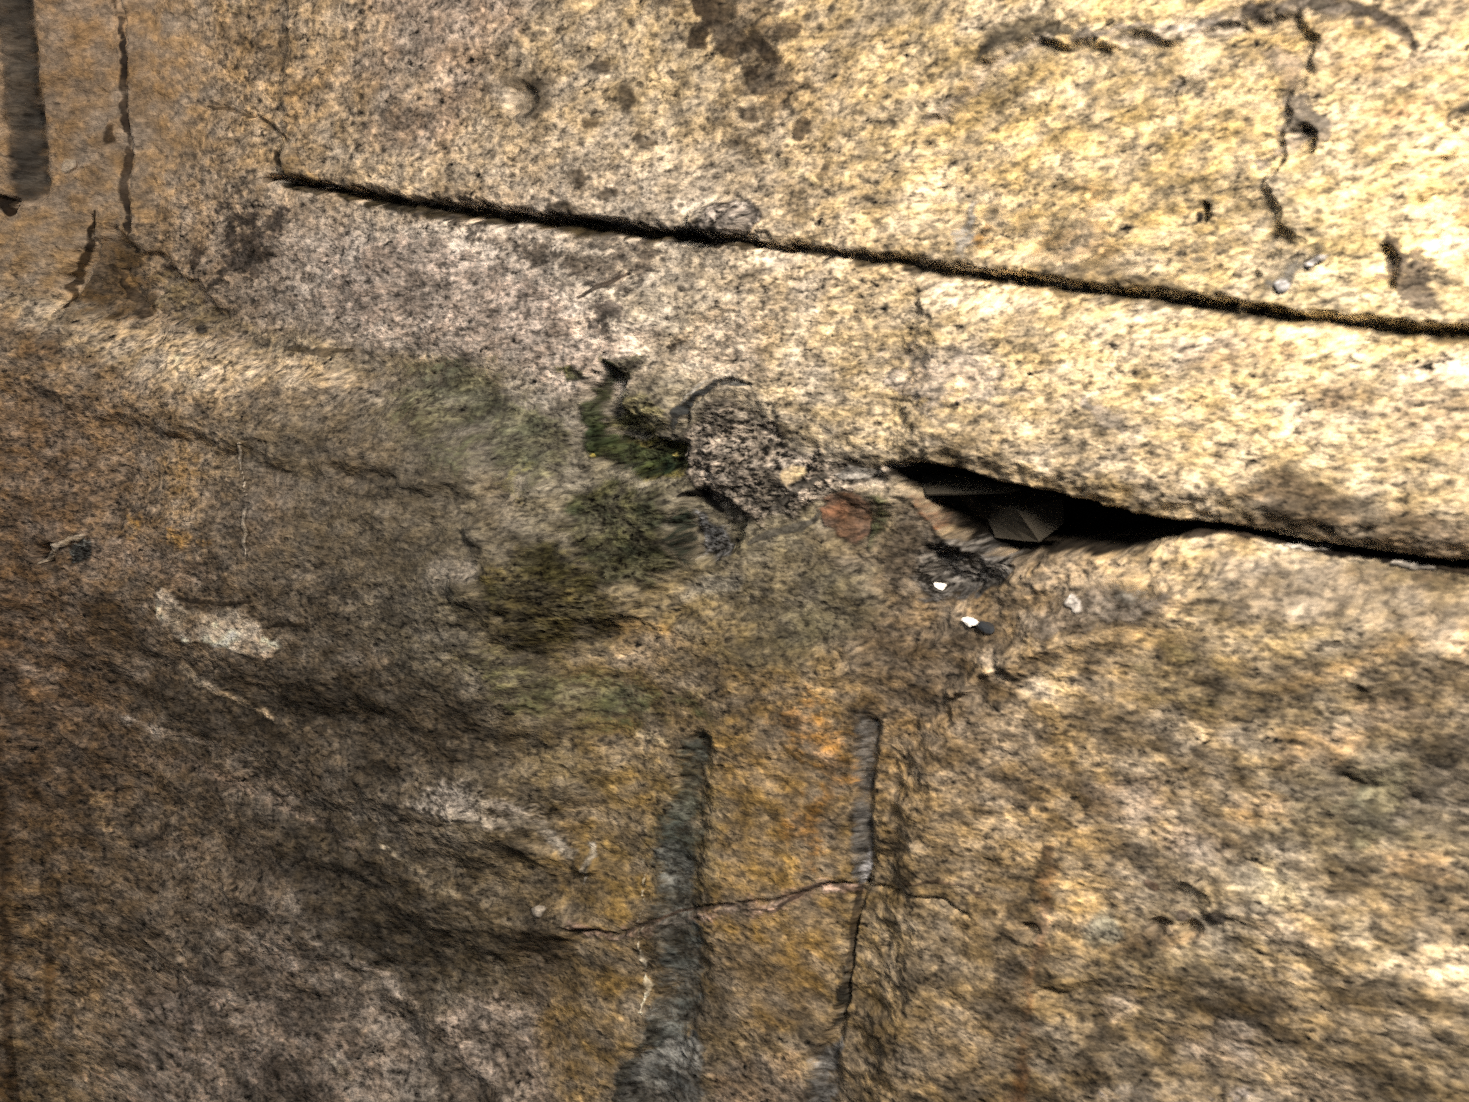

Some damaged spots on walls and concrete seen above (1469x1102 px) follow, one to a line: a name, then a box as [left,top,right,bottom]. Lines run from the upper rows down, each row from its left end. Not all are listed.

crack [104,0,133,236]
crack [577,272,630,299]
crack [1165,520,1469,575]
water stain [121,643,470,798]
water stain [276,826,567,1102]
water stain [404,779,597,883]
water stain [466,541,711,1102]
crack [564,881,864,940]
water stain [807,711,881,1102]
crack [902,879,983,899]
water stain [125,967,363,1102]